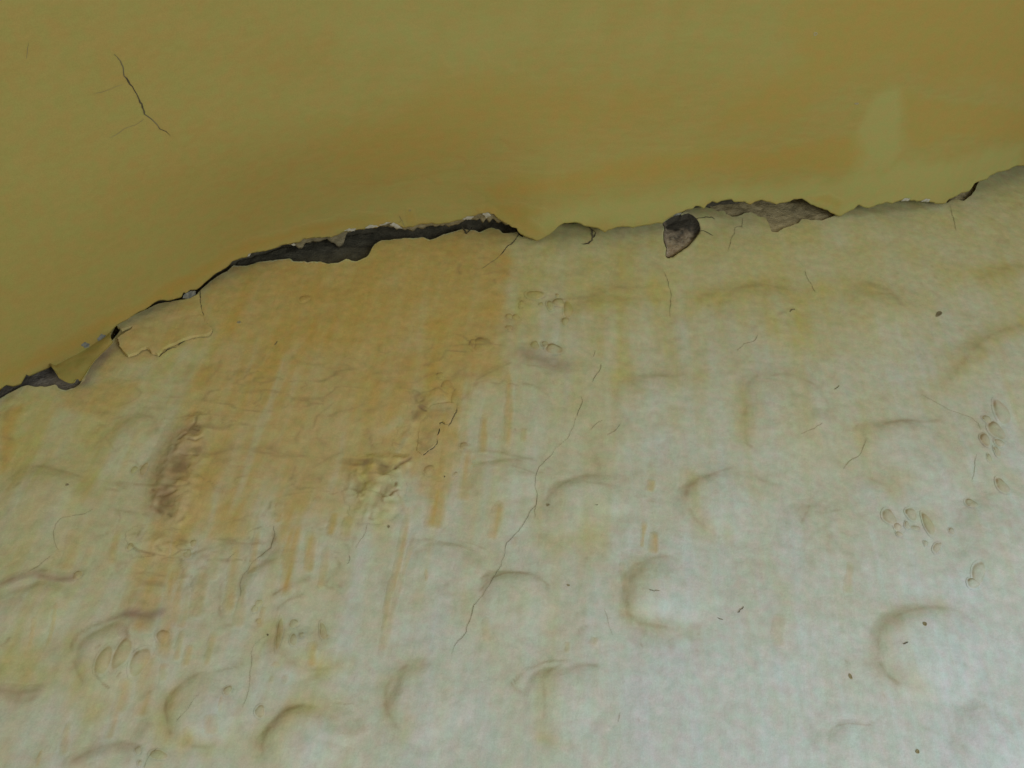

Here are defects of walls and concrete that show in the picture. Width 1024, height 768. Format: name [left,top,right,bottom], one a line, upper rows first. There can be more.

crack [99,54,169,135]
flaking render [237,233,381,266]
flaking render [663,213,700,258]
flaking render [710,200,833,232]
flaking render [947,183,977,203]
leakage [0,210,393,388]
peeling [0,332,113,398]
leakage [49,229,580,768]